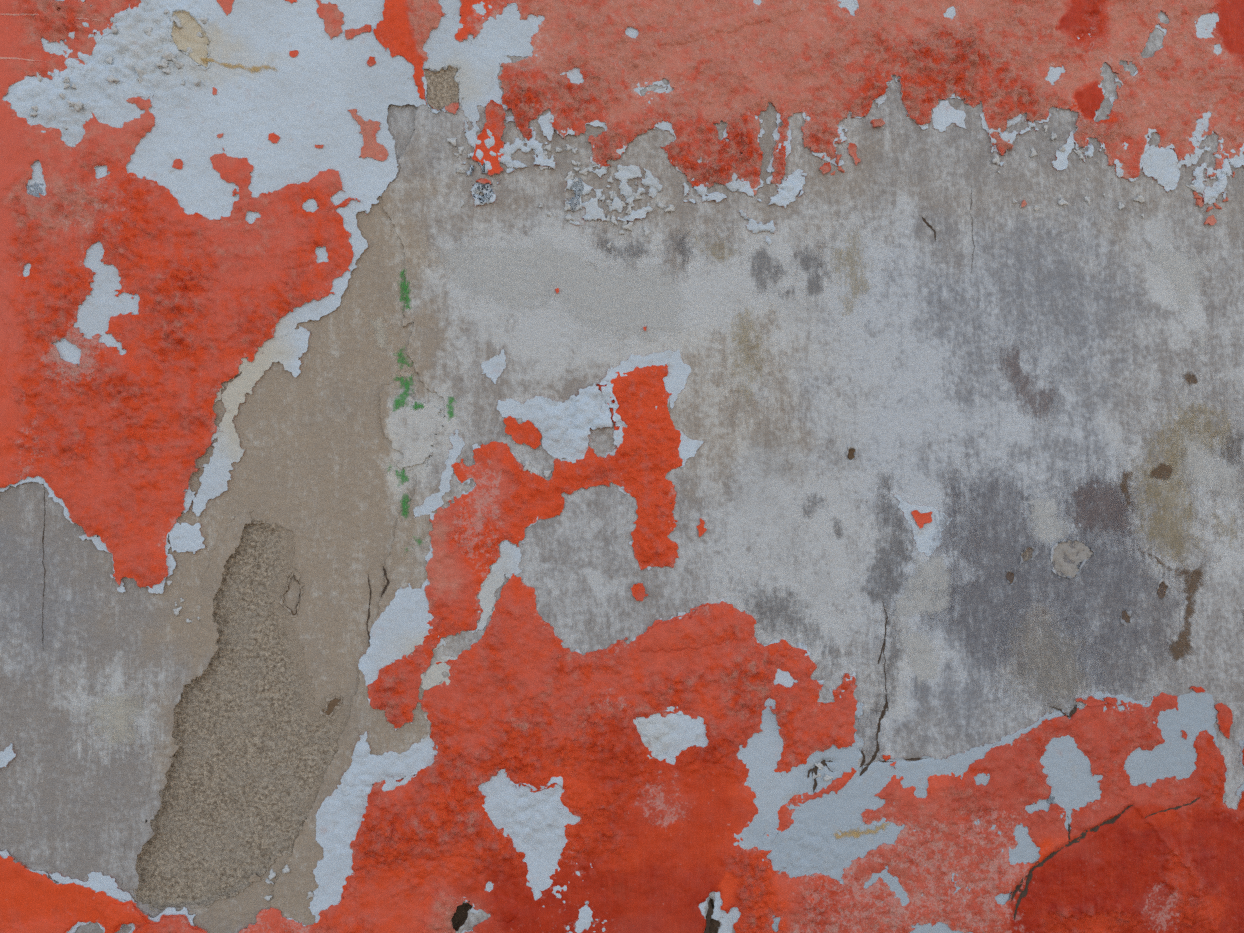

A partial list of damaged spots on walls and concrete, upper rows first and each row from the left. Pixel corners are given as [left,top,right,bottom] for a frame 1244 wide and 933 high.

peeling [1093,11,1169,122]
peeling [1194,12,1222,56]
damp [1001,349,1052,417]
damp [1151,432,1243,498]
damp [1030,481,1131,542]
peeling [633,706,709,765]
peeling [974,735,1103,865]
peeling [478,769,593,907]
crack [1010,798,1199,920]
peeling [451,897,491,933]
peeling [566,901,607,933]
peeling [698,891,741,933]